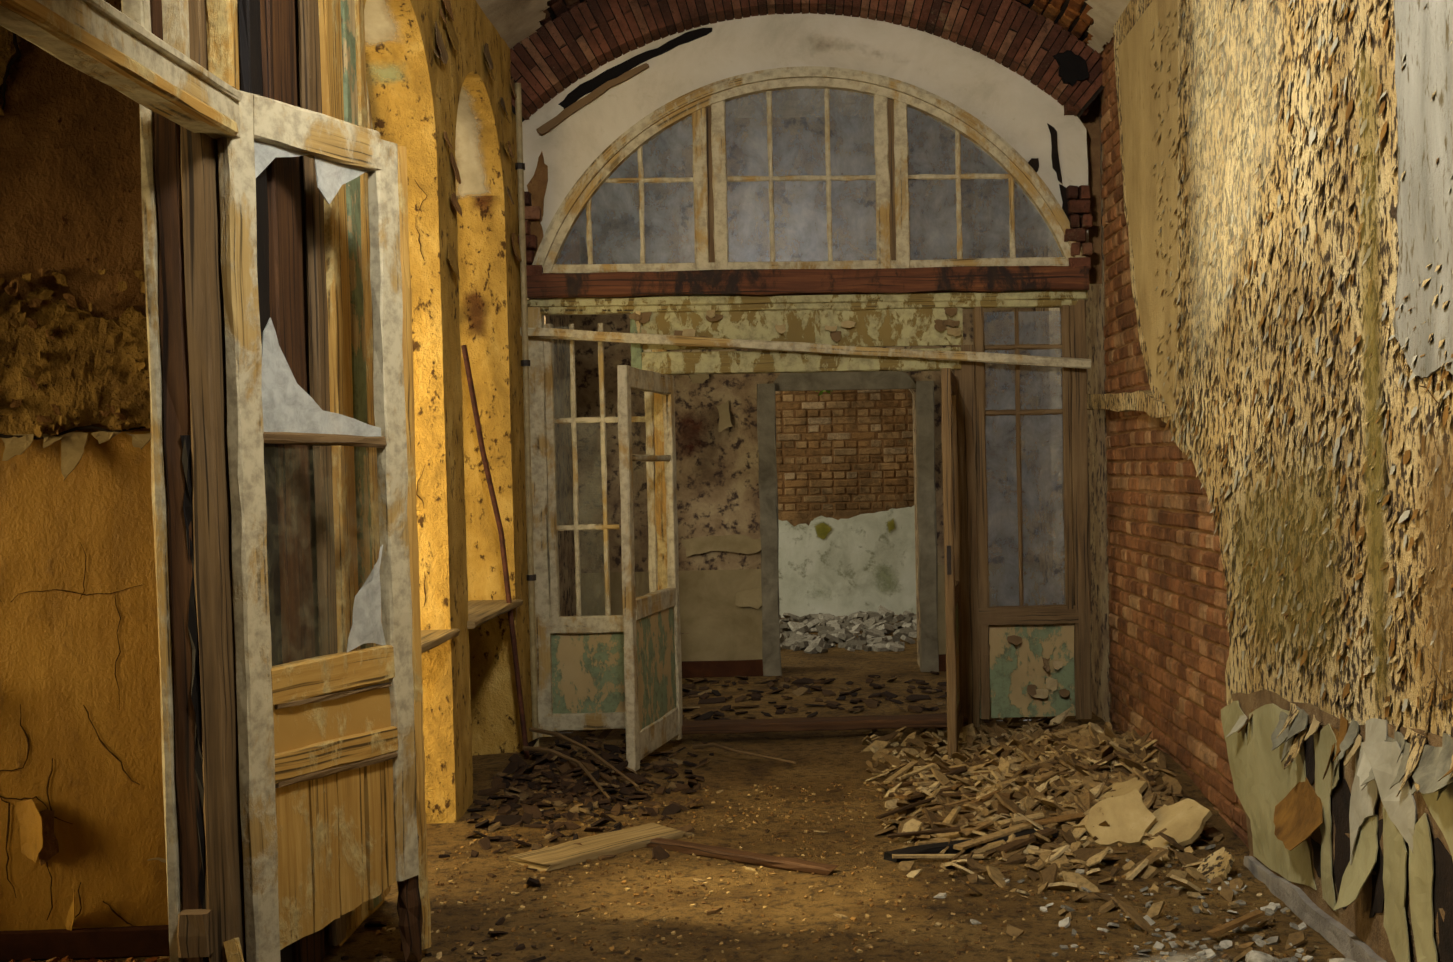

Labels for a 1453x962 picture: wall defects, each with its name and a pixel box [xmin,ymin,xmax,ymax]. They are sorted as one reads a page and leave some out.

peeling [0,25,24,116]
spalling [535,0,587,31]
peeling [0,268,151,480]
peeling [934,308,961,337]
spalling [1012,0,1453,962]
crack [0,542,145,785]
crack [0,704,133,926]